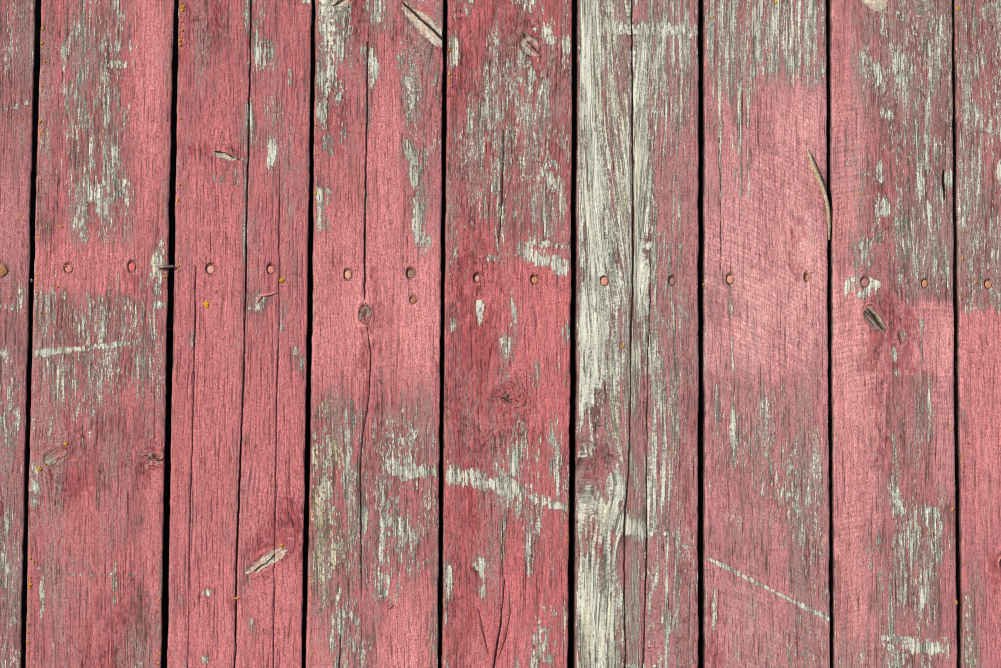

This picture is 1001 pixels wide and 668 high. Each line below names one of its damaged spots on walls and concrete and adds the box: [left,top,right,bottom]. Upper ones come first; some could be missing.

peeling [60,0,137,242]
peeling [465,50,565,251]
peeling [853,0,1001,315]
crack [214,12,275,668]
crack [273,335,281,421]
peeling [475,299,484,325]
peeling [511,0,825,668]
peeling [844,225,882,299]
peeling [311,397,438,668]
peeling [473,557,486,599]
crack [478,580,511,668]
peeling [495,415,562,577]